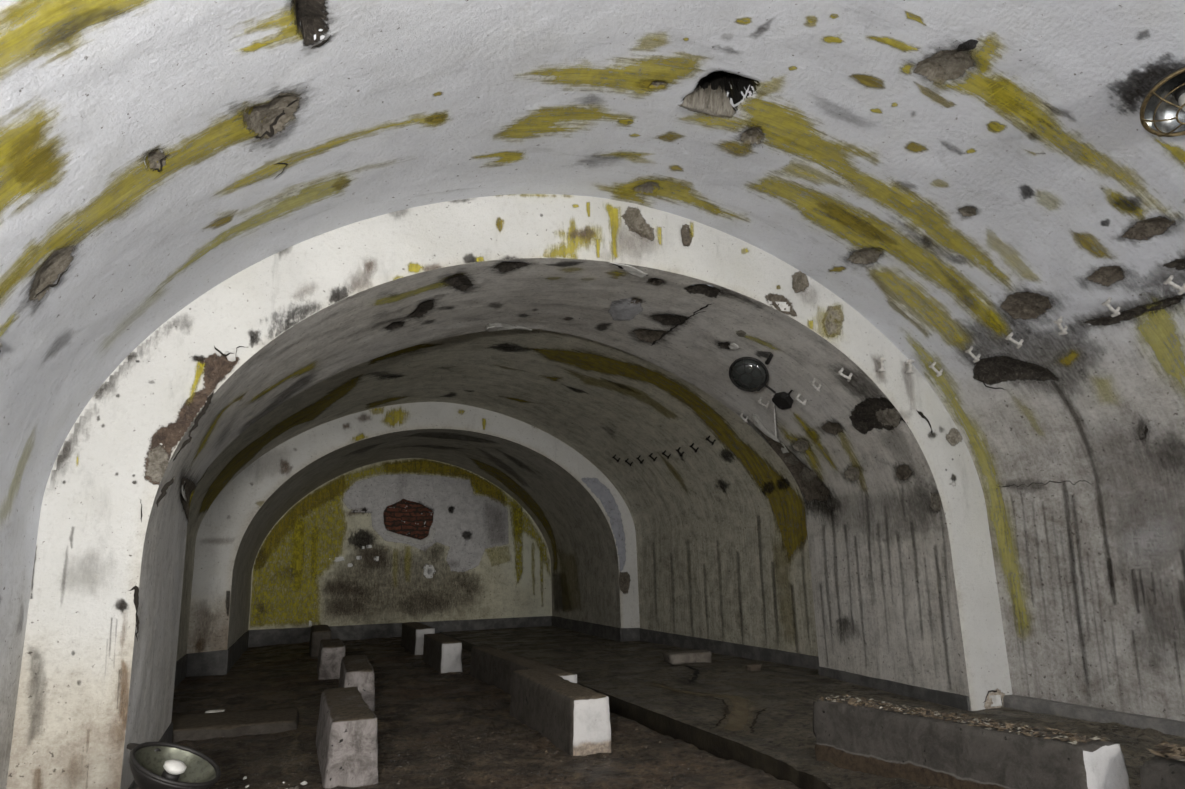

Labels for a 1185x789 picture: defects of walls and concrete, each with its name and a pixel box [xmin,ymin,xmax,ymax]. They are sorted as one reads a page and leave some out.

spalling [679,71,760,118]
spalling [914,39,981,84]
leakage [11,126,62,184]
leakage [819,204,896,244]
leakage [879,285,927,336]
spalling [962,257,1185,390]
spalling [144,346,240,522]
spalling [821,368,914,436]
flaking render [383,499,436,546]
leakage [1056,385,1116,604]
leakage [329,530,476,615]
leakage [1063,482,1087,677]